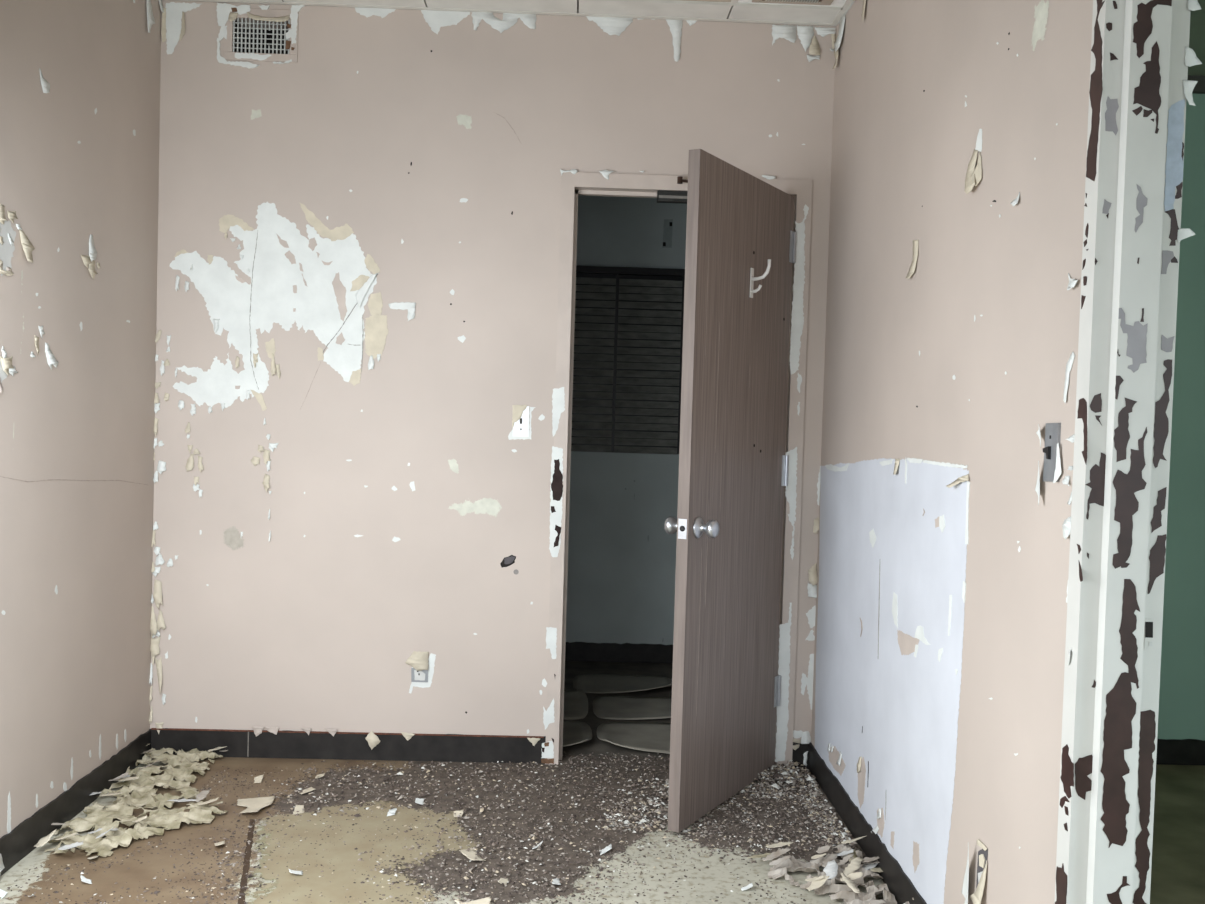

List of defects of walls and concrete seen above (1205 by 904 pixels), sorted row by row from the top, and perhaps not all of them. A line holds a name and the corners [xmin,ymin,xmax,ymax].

peeling [421,10,536,34]
peeling [0,204,35,276]
peeling [153,202,416,497]
peeling [789,204,809,415]
peeling [964,129,982,194]
peeling [1067,223,1098,309]
peeling [1084,0,1202,274]
peeling [538,387,565,557]
peeling [149,522,179,734]
peeling [775,447,970,904]
peeling [1060,308,1174,904]
peeling [1055,864,1067,904]